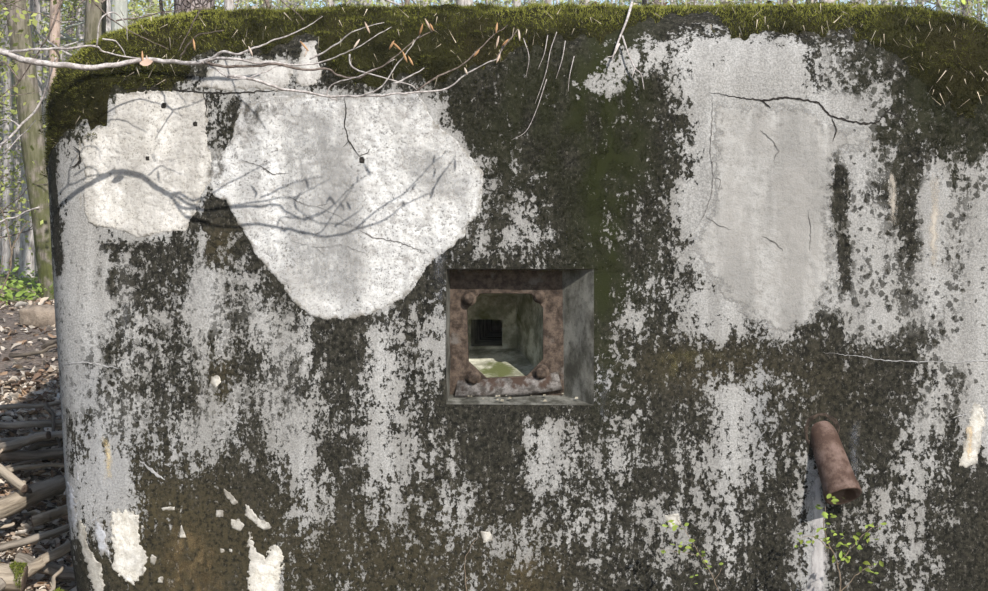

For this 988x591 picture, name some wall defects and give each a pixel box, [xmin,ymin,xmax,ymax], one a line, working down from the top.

spalling [77,40,484,320]
leakage [290,114,355,293]
crack [695,92,910,230]
efflorescence [959,402,986,468]
leakage [64,444,157,591]
leakage [224,489,285,591]
leakage [807,474,828,591]